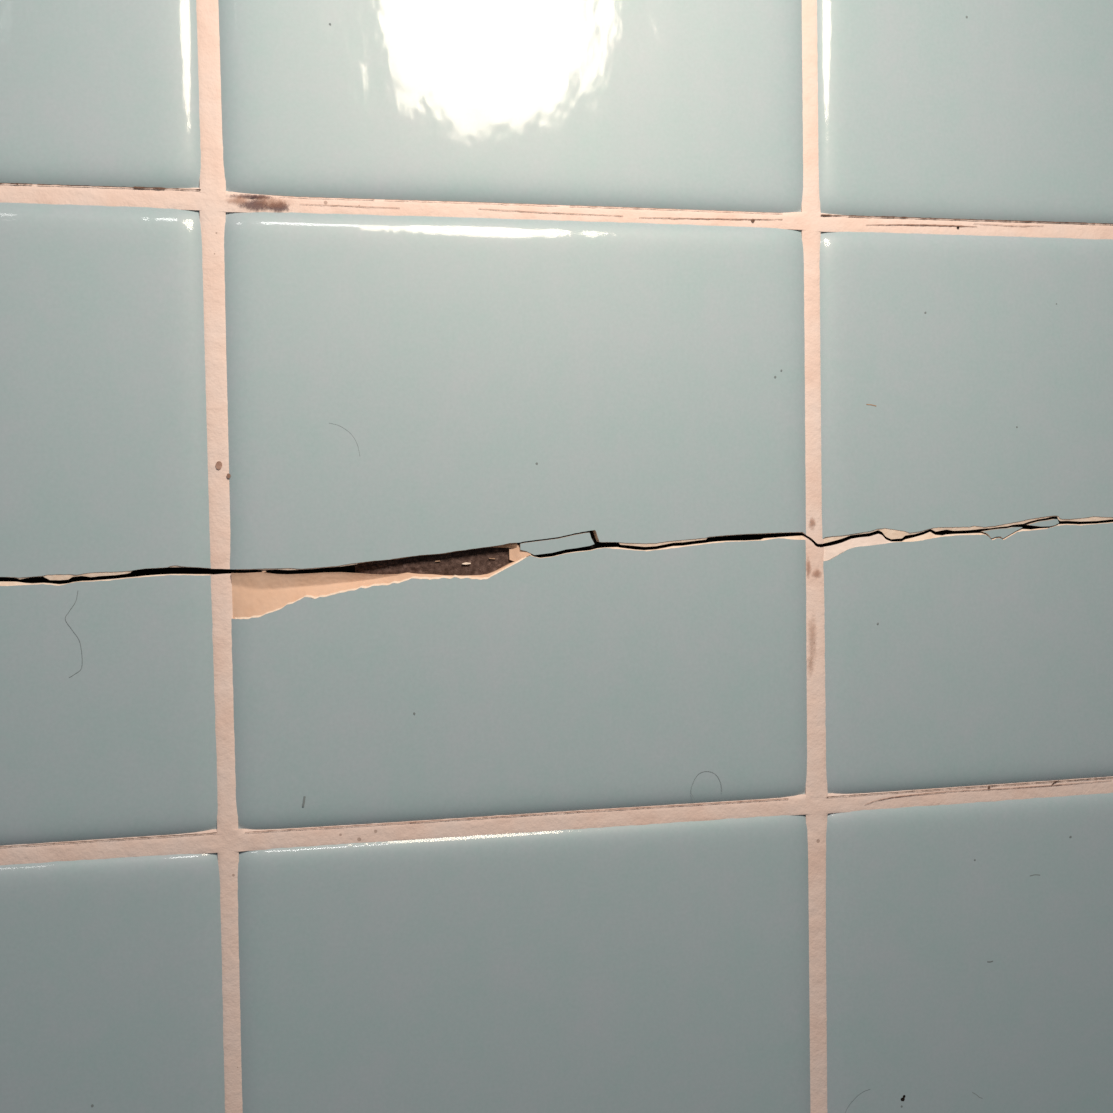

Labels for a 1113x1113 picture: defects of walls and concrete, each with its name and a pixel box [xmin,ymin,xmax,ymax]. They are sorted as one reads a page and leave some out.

spalling [231,557,526,619]
crack [0,516,1113,678]